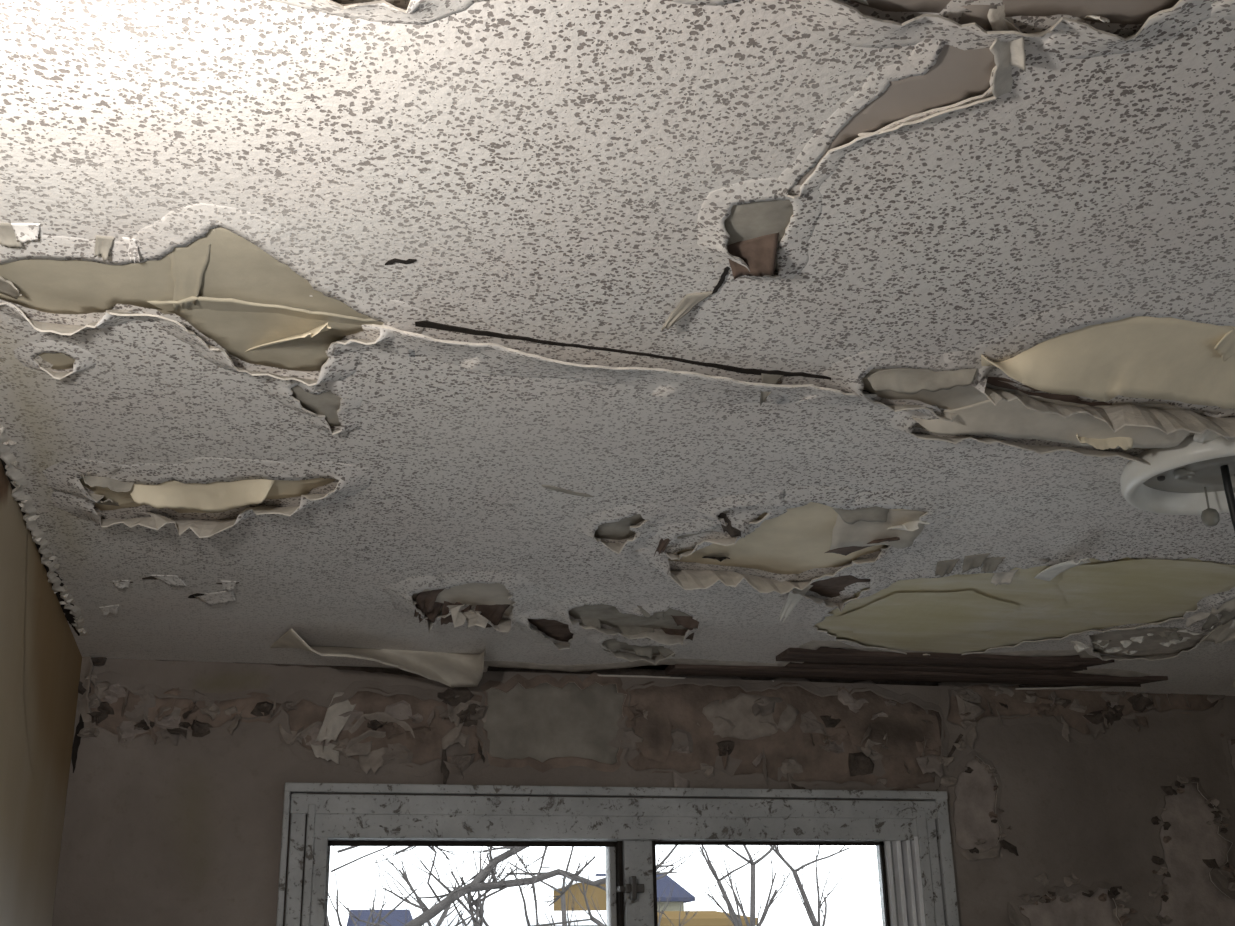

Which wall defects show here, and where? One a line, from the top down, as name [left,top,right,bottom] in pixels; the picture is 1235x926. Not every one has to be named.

peeling [272,0,490,25]
peeling [661,0,1235,331]
peeling [0,203,427,435]
crack [362,321,877,416]
peeling [823,293,1235,465]
peeling [42,457,373,538]
peeling [77,671,286,749]
peeling [270,486,1235,861]
flaking render [1012,775,1235,926]